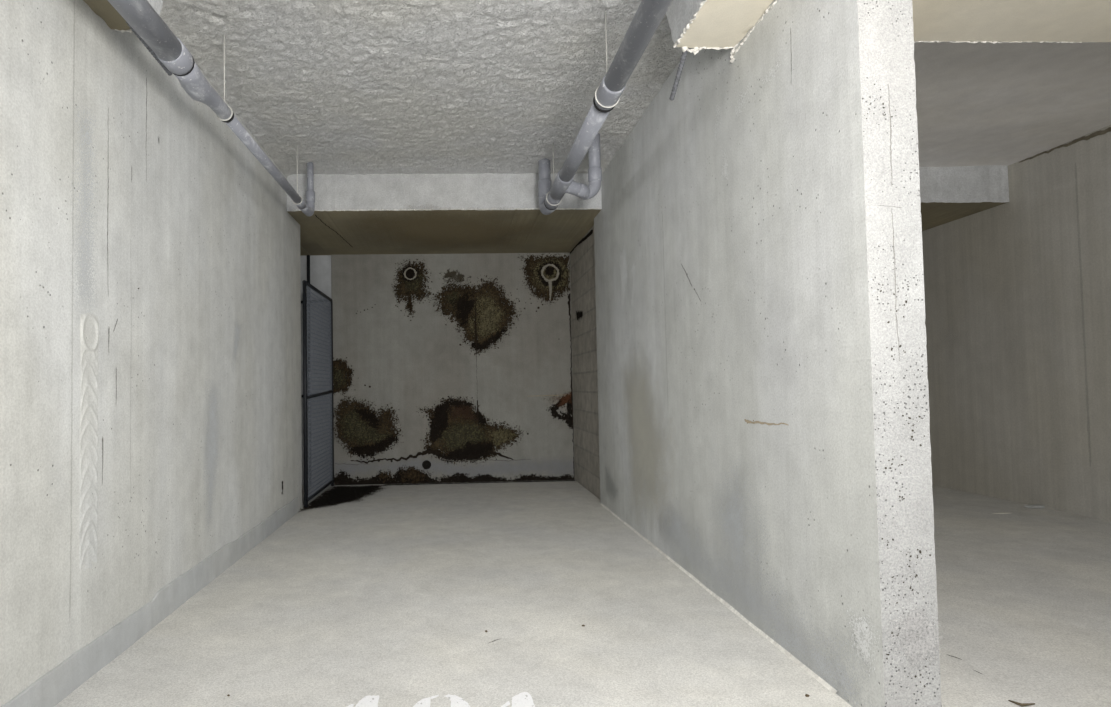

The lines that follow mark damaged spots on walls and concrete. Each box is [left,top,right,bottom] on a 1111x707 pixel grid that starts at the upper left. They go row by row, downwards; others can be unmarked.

crack [335,302,526,465]
rust [544,393,573,429]